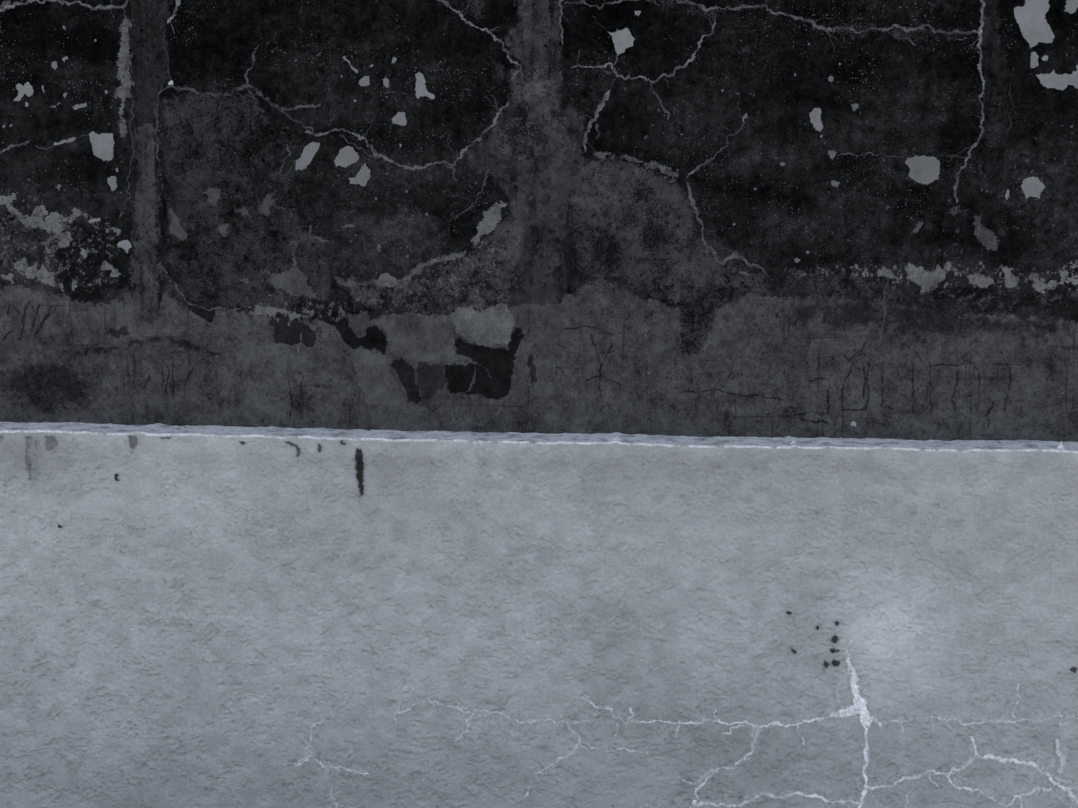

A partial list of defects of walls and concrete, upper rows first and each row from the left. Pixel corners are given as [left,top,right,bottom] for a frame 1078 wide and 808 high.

crack [0,134,88,156]
crack [0,0,129,34]
flaking render [0,200,132,299]
crack [119,0,522,291]
flaking render [161,89,518,403]
peeling [609,28,635,56]
crack [686,97,769,277]
crack [558,0,1014,203]
flaking render [567,155,1078,355]
peeling [1014,0,1078,90]
flaking render [444,328,537,400]
crack [393,640,1078,808]